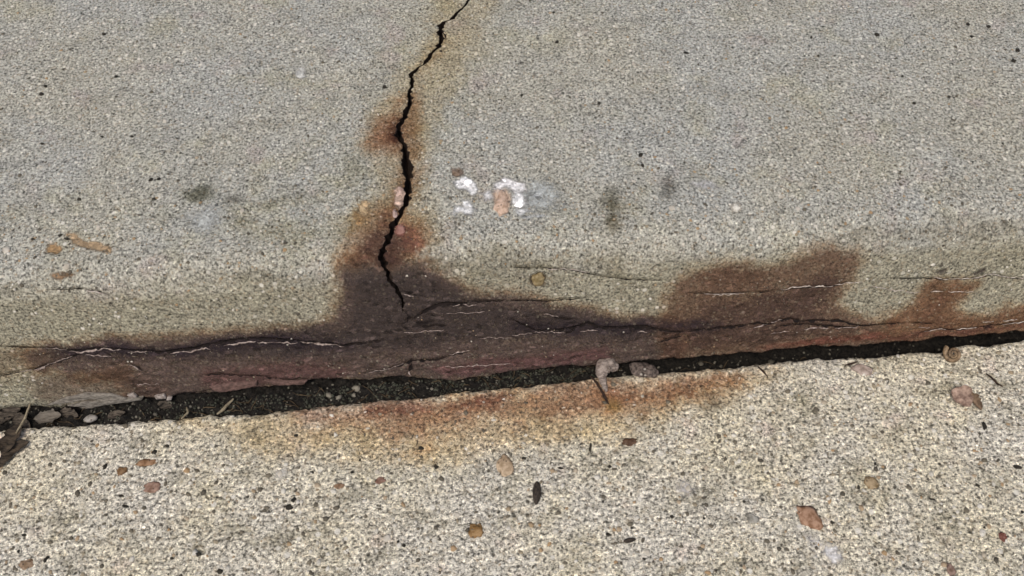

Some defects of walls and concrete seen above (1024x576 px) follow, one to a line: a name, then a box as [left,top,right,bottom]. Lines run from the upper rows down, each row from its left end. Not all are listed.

crack [2,0,1024,385]
corrosion [15,251,1024,401]